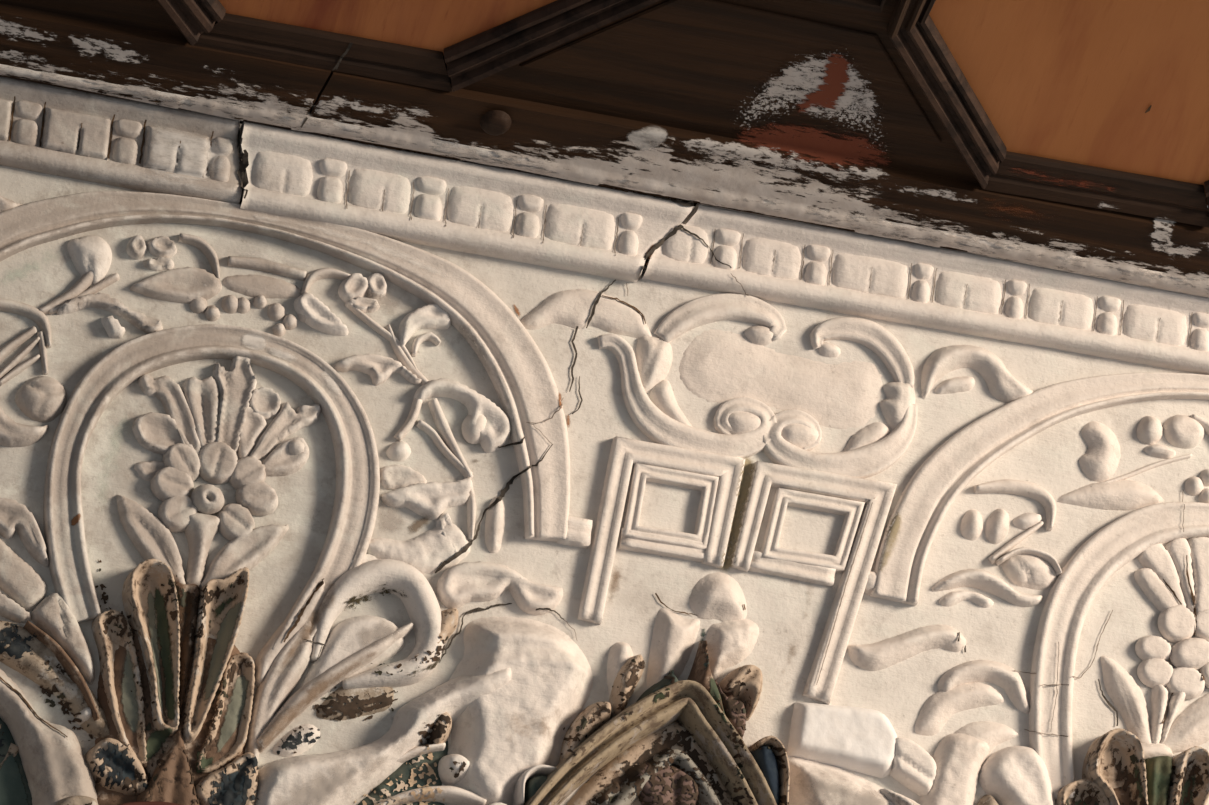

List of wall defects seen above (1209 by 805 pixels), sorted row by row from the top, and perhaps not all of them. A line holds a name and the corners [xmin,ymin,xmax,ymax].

crack [234,117,249,199]
crack [301,42,749,573]
peeling [95,560,156,731]
peeling [161,575,244,724]
flaking render [371,608,458,675]
crack [655,593,697,616]
peeling [40,660,168,801]
peeling [184,750,259,805]
peeling [277,687,398,755]
peeling [355,714,466,805]
peeling [561,657,675,764]
peeling [587,668,787,805]